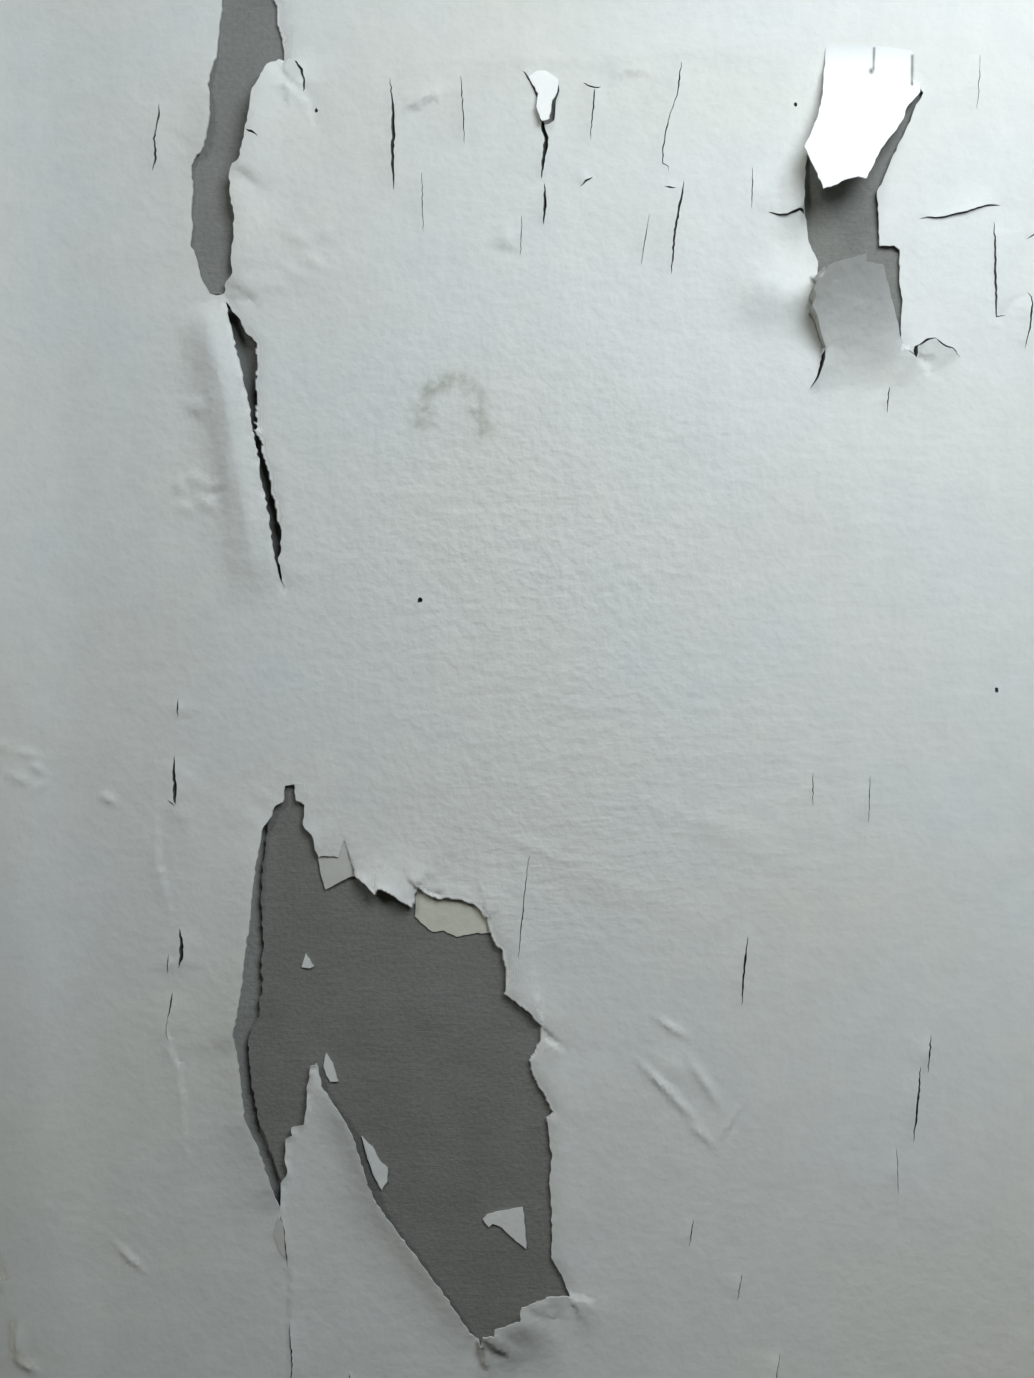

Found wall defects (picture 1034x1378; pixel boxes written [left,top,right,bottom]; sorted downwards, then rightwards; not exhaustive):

peeling [174,0,311,608]
peeling [518,65,571,234]
peeling [763,41,971,416]
crack [910,196,1034,359]
crack [968,45,989,118]
peeling [216,766,588,1378]